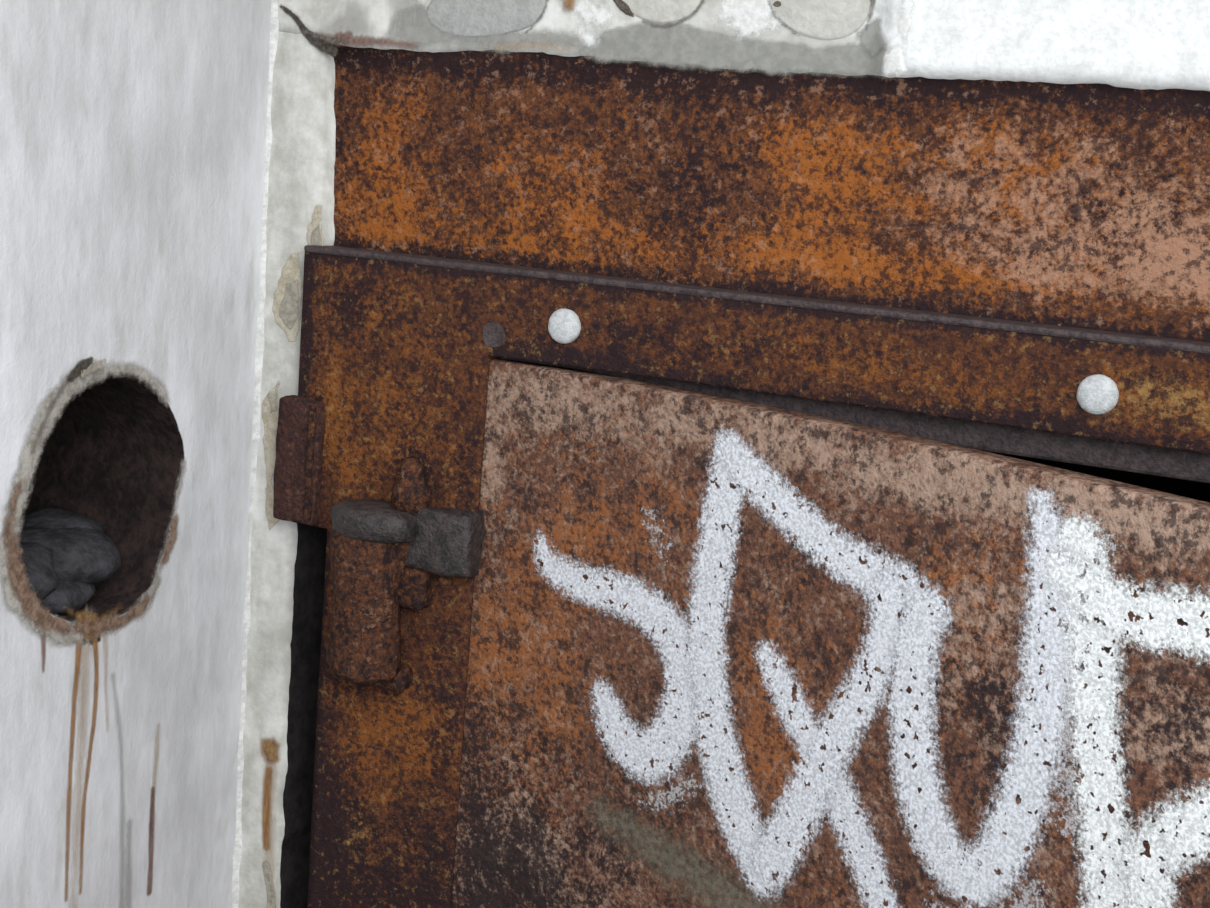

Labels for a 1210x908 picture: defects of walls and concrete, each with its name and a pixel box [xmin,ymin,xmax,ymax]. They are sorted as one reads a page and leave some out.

spalling [0,363,185,645]
corrosion [65,612,111,901]
corrosion [261,739,279,908]